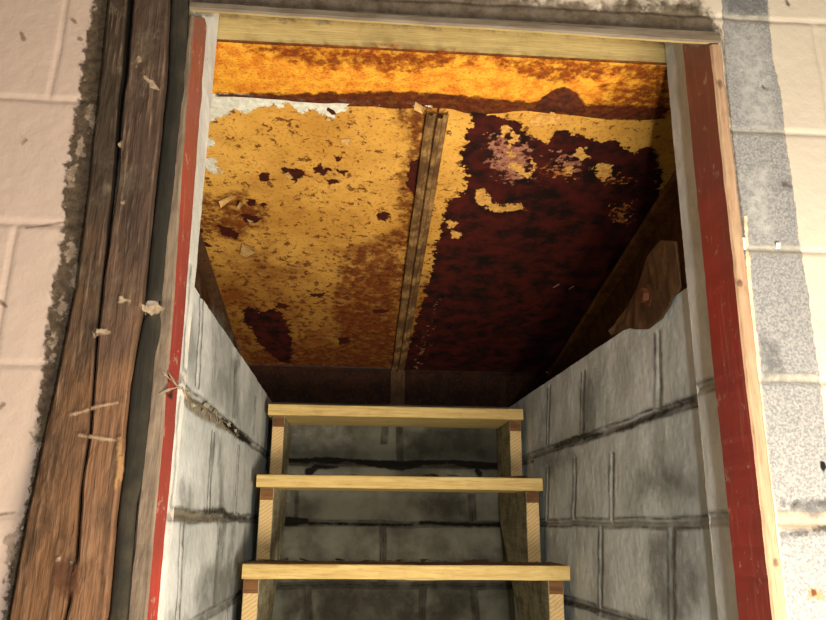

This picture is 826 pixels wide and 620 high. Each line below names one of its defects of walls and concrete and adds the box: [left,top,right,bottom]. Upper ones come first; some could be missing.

corrosion [252,44,457,73]
corrosion [200,192,267,247]
corrosion [216,56,670,373]
crack [222,419,252,445]
crack [553,399,694,448]
crack [289,457,498,477]
crack [205,508,247,521]